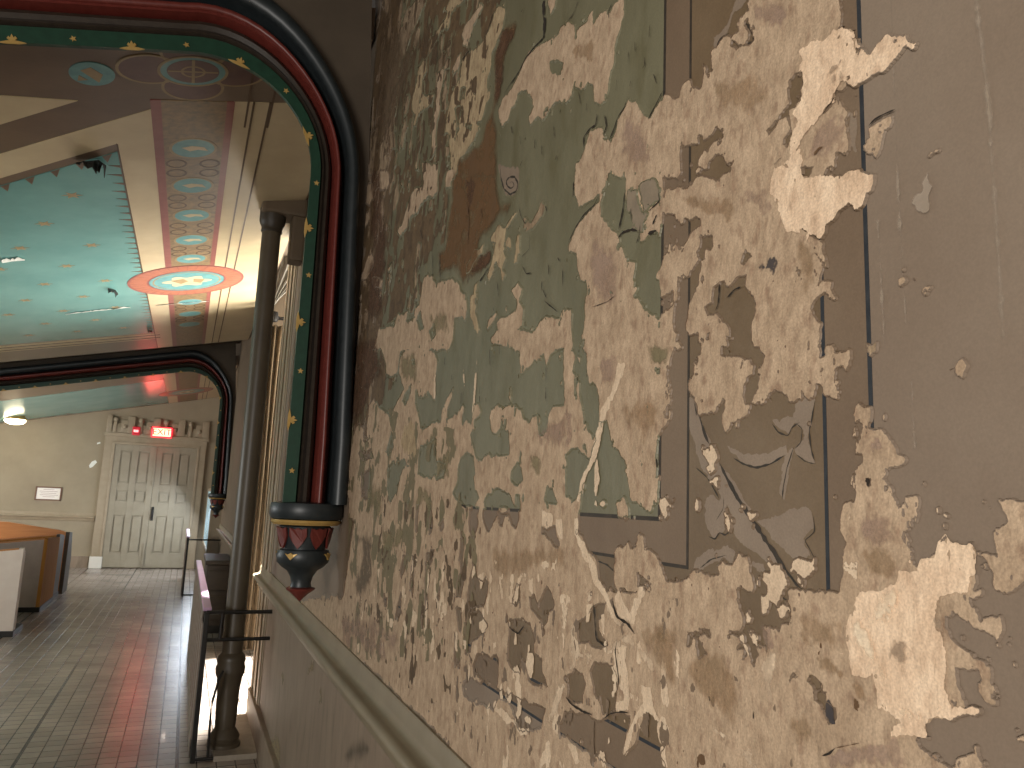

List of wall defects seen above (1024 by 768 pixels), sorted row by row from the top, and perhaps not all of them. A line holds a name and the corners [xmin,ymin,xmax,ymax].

peeling [76,160,106,178]
peeling [301,0,1024,768]